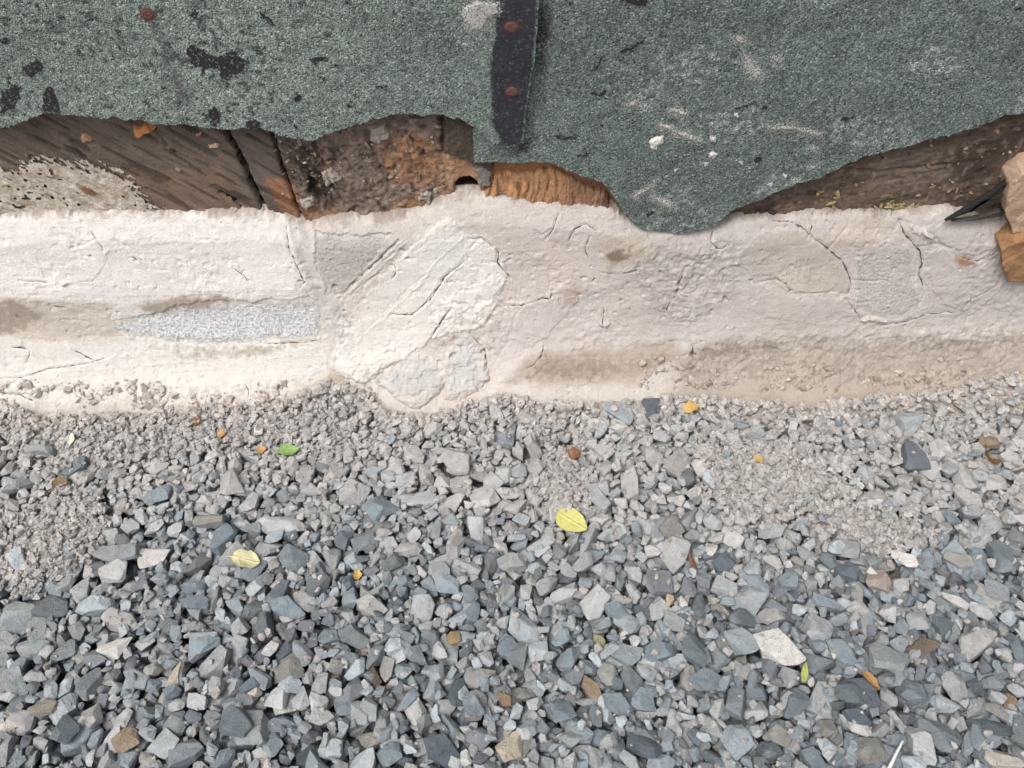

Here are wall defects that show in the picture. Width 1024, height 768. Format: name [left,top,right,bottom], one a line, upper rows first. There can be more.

peeling [0,154,168,215]
crack [392,263,462,338]
crack [548,218,629,274]
crack [774,218,997,326]